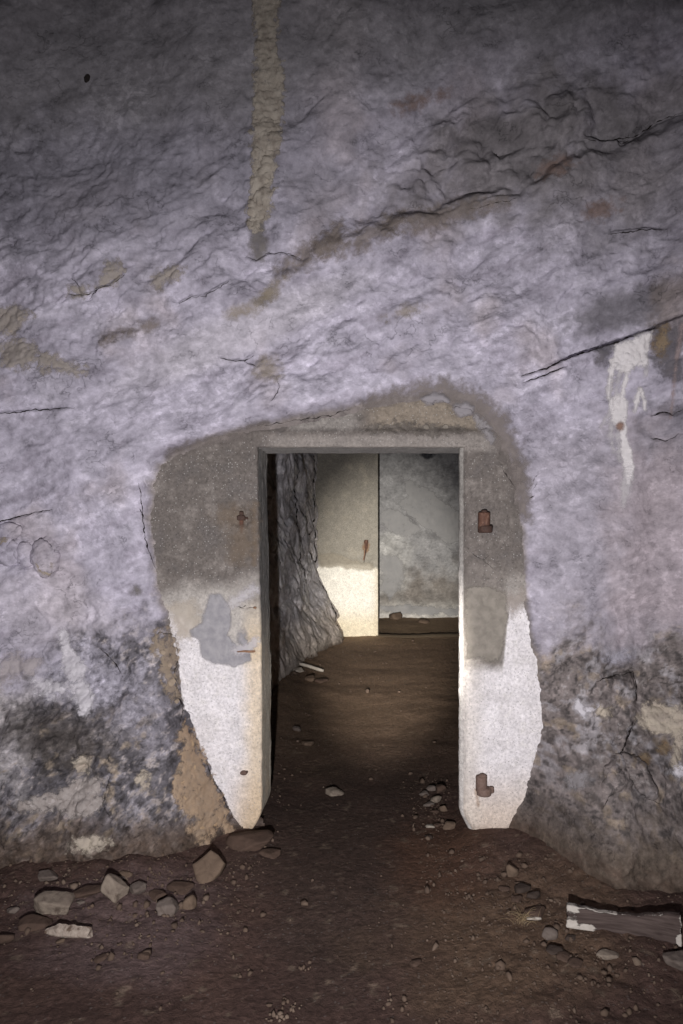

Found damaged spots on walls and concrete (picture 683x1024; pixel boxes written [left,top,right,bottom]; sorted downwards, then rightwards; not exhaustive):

crack [585,113,681,144]
water stain [250,223,267,260]
crack [522,328,655,383]
water stain [594,324,683,506]
crack [596,671,637,753]